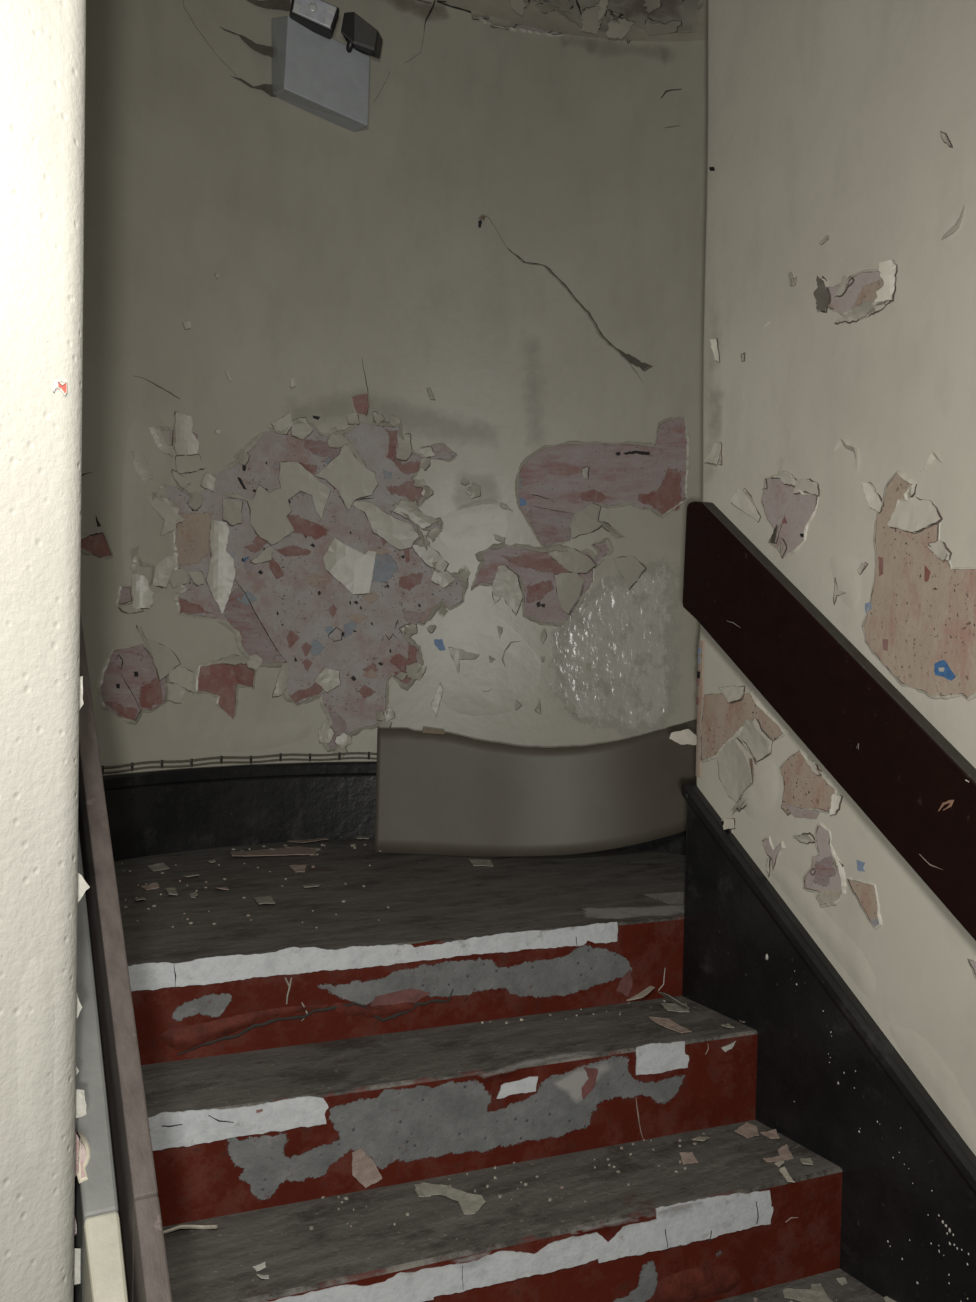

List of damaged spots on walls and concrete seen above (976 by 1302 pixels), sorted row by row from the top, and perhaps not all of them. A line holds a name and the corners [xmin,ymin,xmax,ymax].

crack [373,0,471,103]
crack [488,217,653,384]
peeling [813,260,898,325]
peeling [730,471,820,559]
peeling [79,393,722,757]
peeling [833,439,976,701]
peeling [669,640,882,930]
spalling [172,993,232,1023]
spalling [317,943,692,1033]
spalling [227,1056,686,1200]
peeling [414,1182,486,1215]
spalling [614,1260,658,1302]